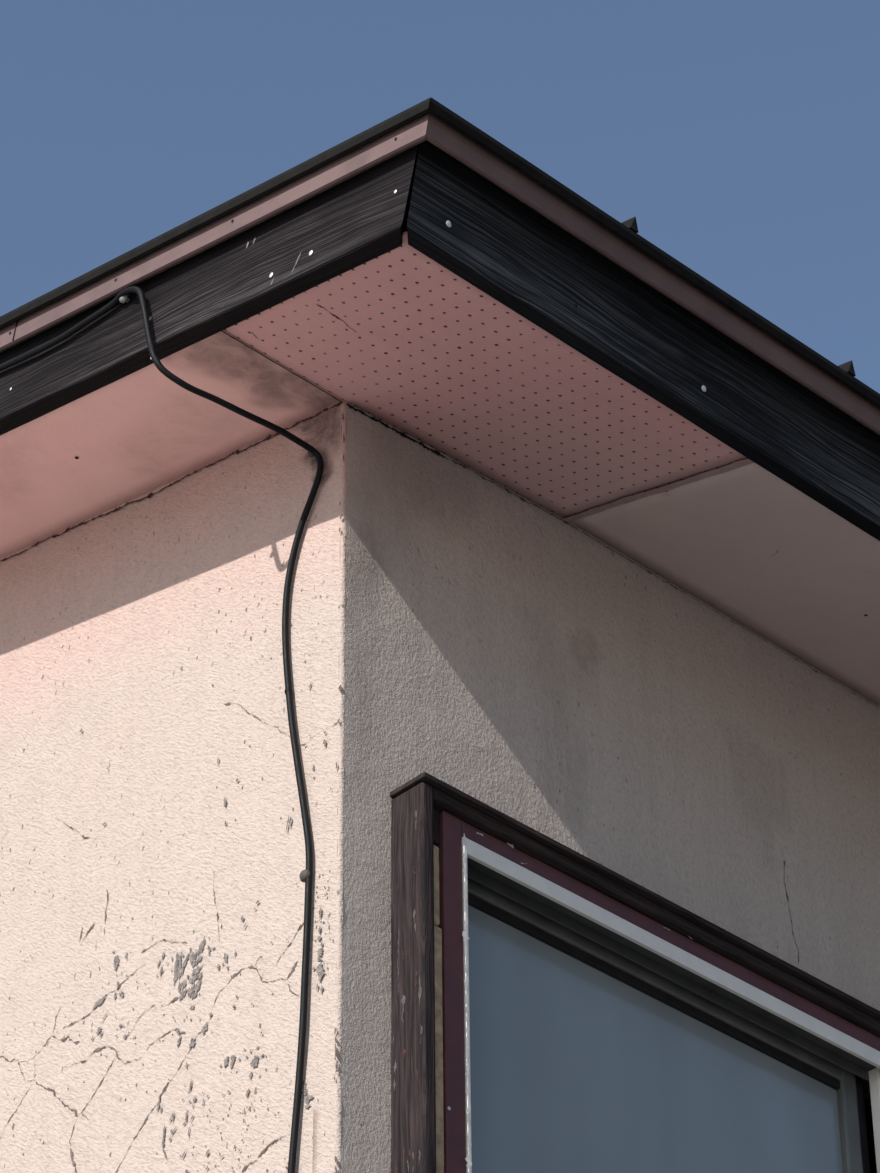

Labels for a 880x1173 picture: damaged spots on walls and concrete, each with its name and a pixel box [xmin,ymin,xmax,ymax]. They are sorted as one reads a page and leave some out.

crack [79,892,108,943]
crack [0,923,303,1173]
peeling [91,930,267,1173]